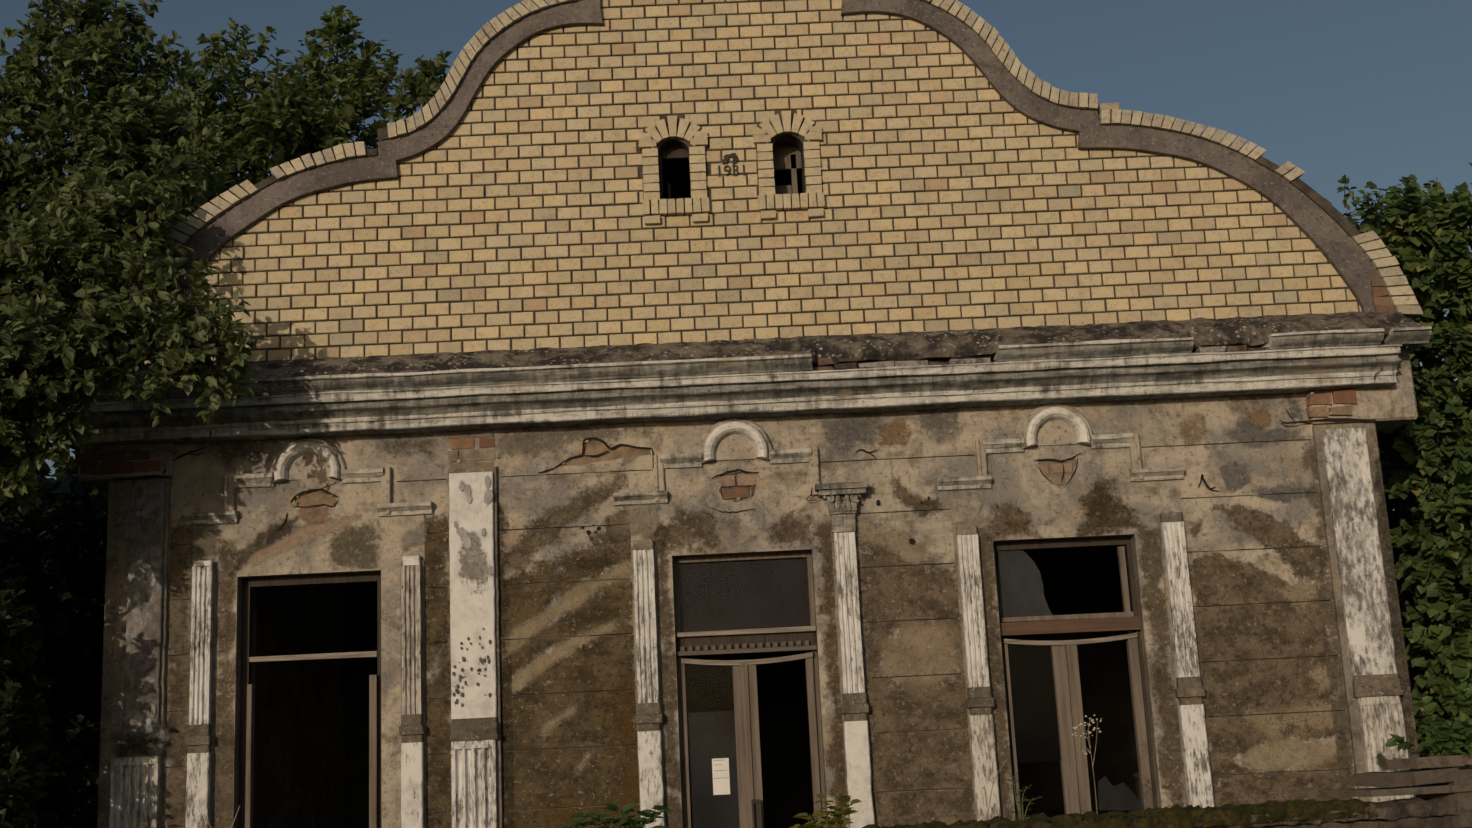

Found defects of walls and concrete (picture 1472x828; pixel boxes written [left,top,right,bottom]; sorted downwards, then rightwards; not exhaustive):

spalling [560,440,651,466]
water stain [1226,393,1304,446]
spalling [1305,390,1357,419]
peeling [246,491,361,566]
water stain [331,525,380,569]
peeling [454,521,493,592]
water stain [497,472,640,828]
water stain [649,509,721,828]
water stain [1189,445,1355,807]